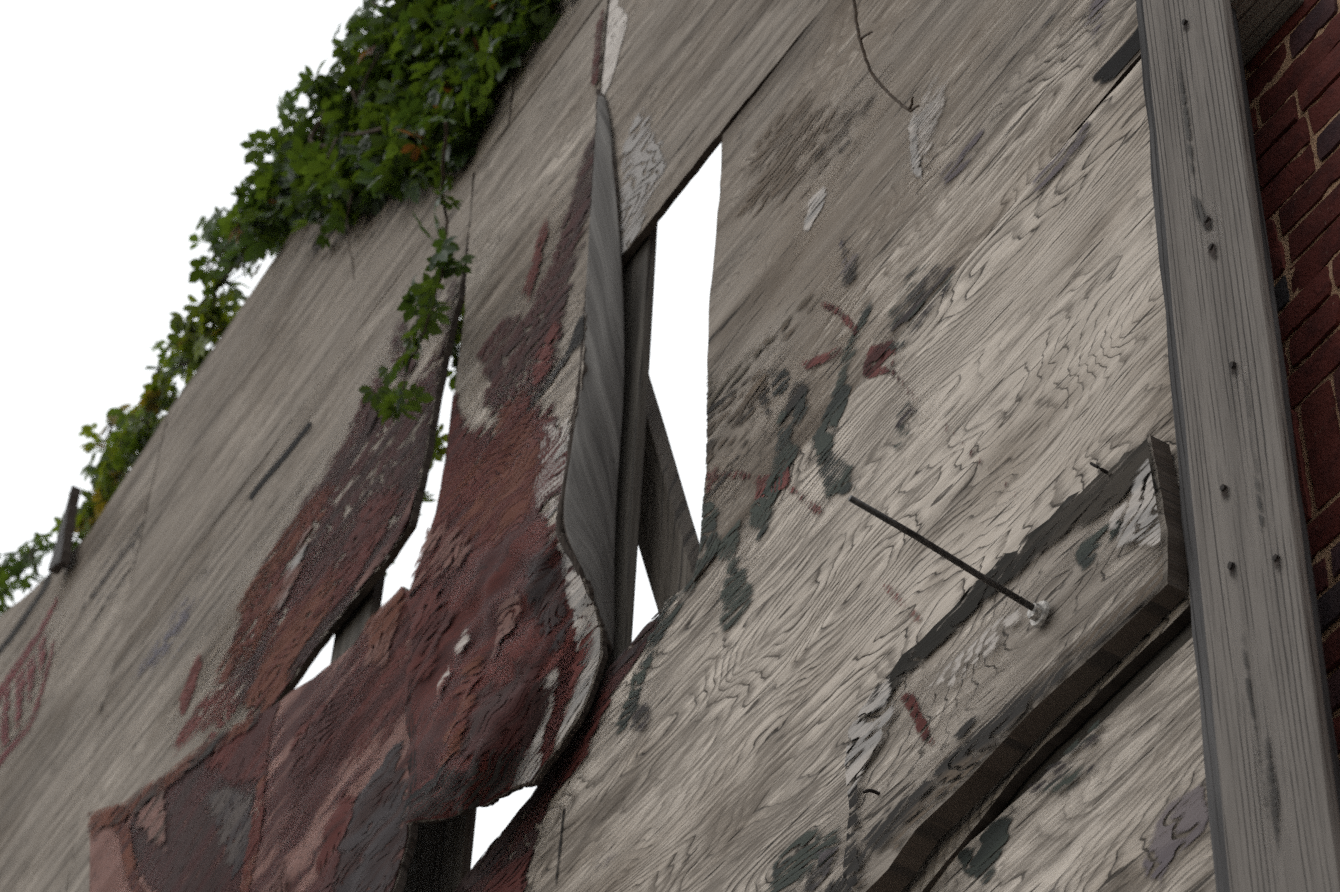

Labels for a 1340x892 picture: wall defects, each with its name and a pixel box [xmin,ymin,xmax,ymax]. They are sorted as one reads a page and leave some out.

peeling [87,702,279,892]
peeling [401,387,600,824]